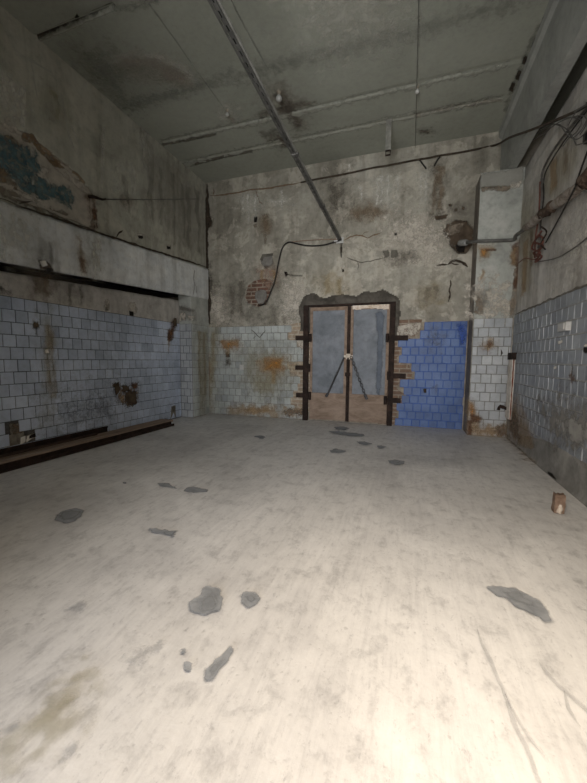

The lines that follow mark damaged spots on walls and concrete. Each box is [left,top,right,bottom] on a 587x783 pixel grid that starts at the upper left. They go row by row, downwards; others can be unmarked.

peeling [0,117,94,227]
flaking render [381,204,474,269]
flaking render [245,278,272,307]
spalling [112,382,140,410]
corrosion [168,318,177,341]
peeling [280,270,310,412]
peeling [378,319,422,425]
peeling [3,423,36,448]